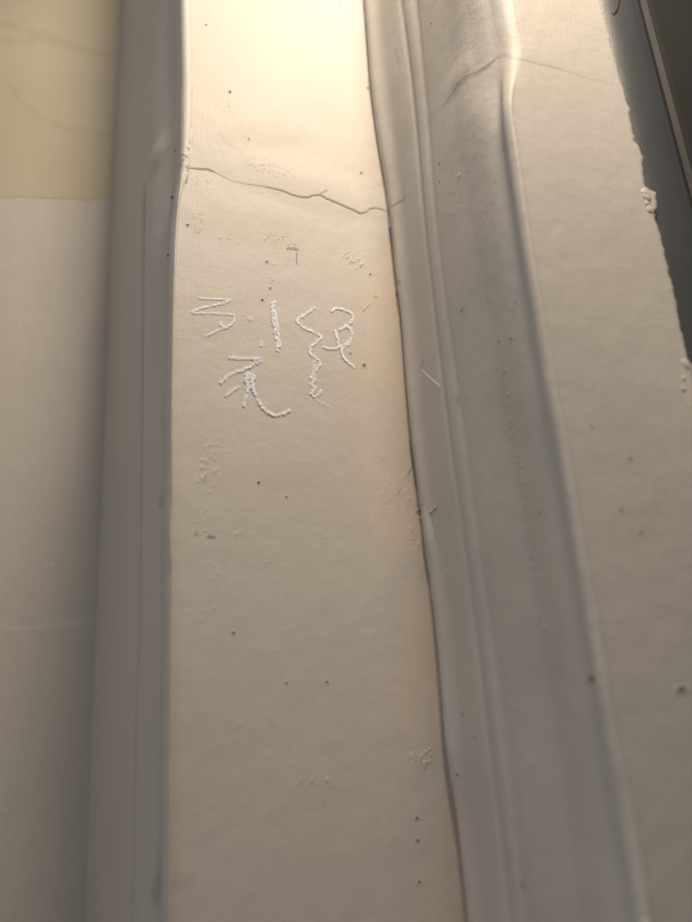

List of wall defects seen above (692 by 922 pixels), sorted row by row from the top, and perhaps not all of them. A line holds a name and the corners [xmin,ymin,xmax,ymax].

crack [431,54,603,118]
crack [179,157,404,213]